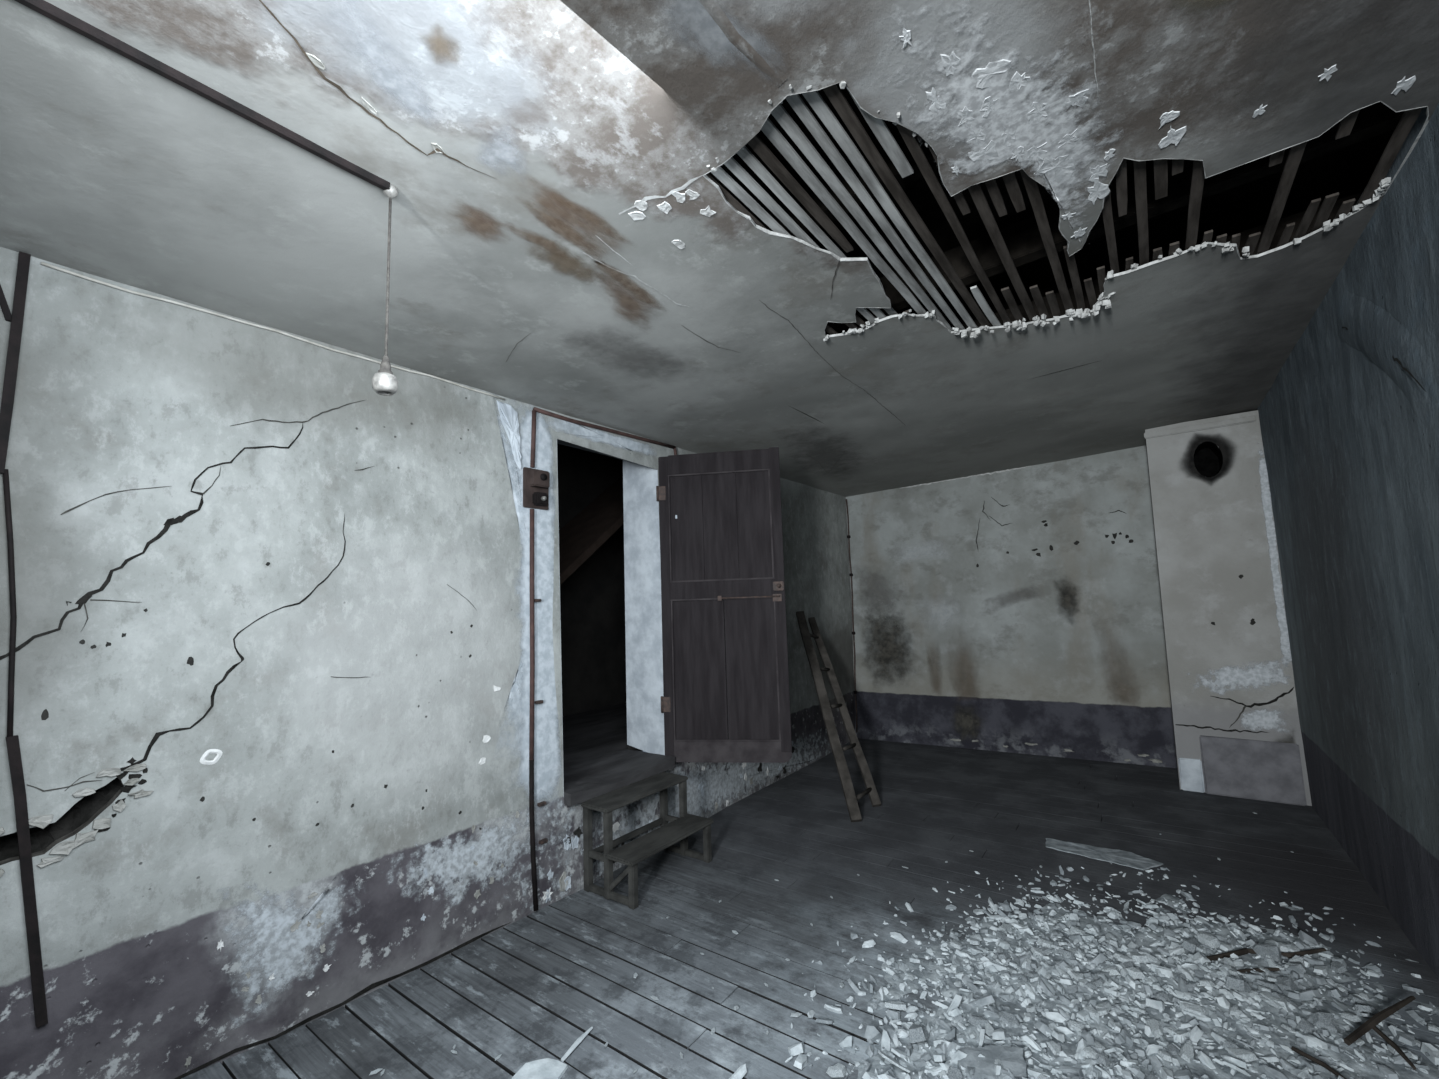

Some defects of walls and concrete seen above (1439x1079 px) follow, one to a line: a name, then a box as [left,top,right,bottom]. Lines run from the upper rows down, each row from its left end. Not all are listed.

leakage [429,35,454,56]
crack [259,0,493,178]
peeling [1318,64,1338,81]
peeling [1391,76,1416,96]
flaking render [893,4,1119,239]
peeling [1158,110,1187,149]
leakage [547,249,592,279]
crack [0,400,364,660]
leakage [1059,586,1077,616]
leakage [868,618,909,680]
crack [0,514,346,877]
crack [1175,687,1294,733]